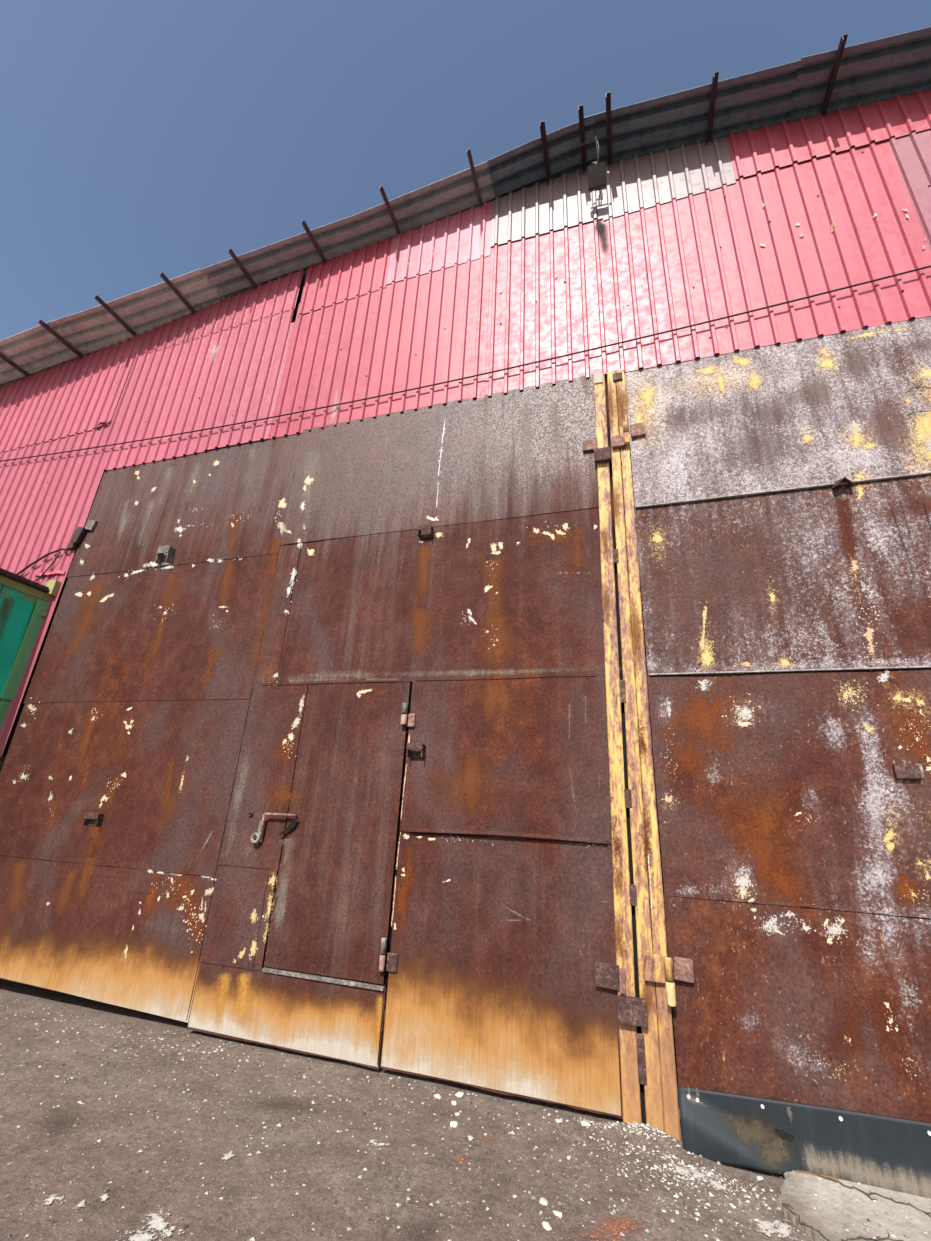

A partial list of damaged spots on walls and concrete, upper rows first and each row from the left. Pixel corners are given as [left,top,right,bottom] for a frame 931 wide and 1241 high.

damp [596,206,607,251]
peeling [275,475,315,556]
peeling [526,521,569,539]
peeling [484,542,520,594]
rust [481,559,515,716]
rust [144,869,208,941]
peeling [147,870,216,953]
peeling [732,866,848,944]
rust [0,936,621,1116]
rust [829,991,903,1058]
crack [782,1202,904,1241]
crack [801,1170,931,1216]